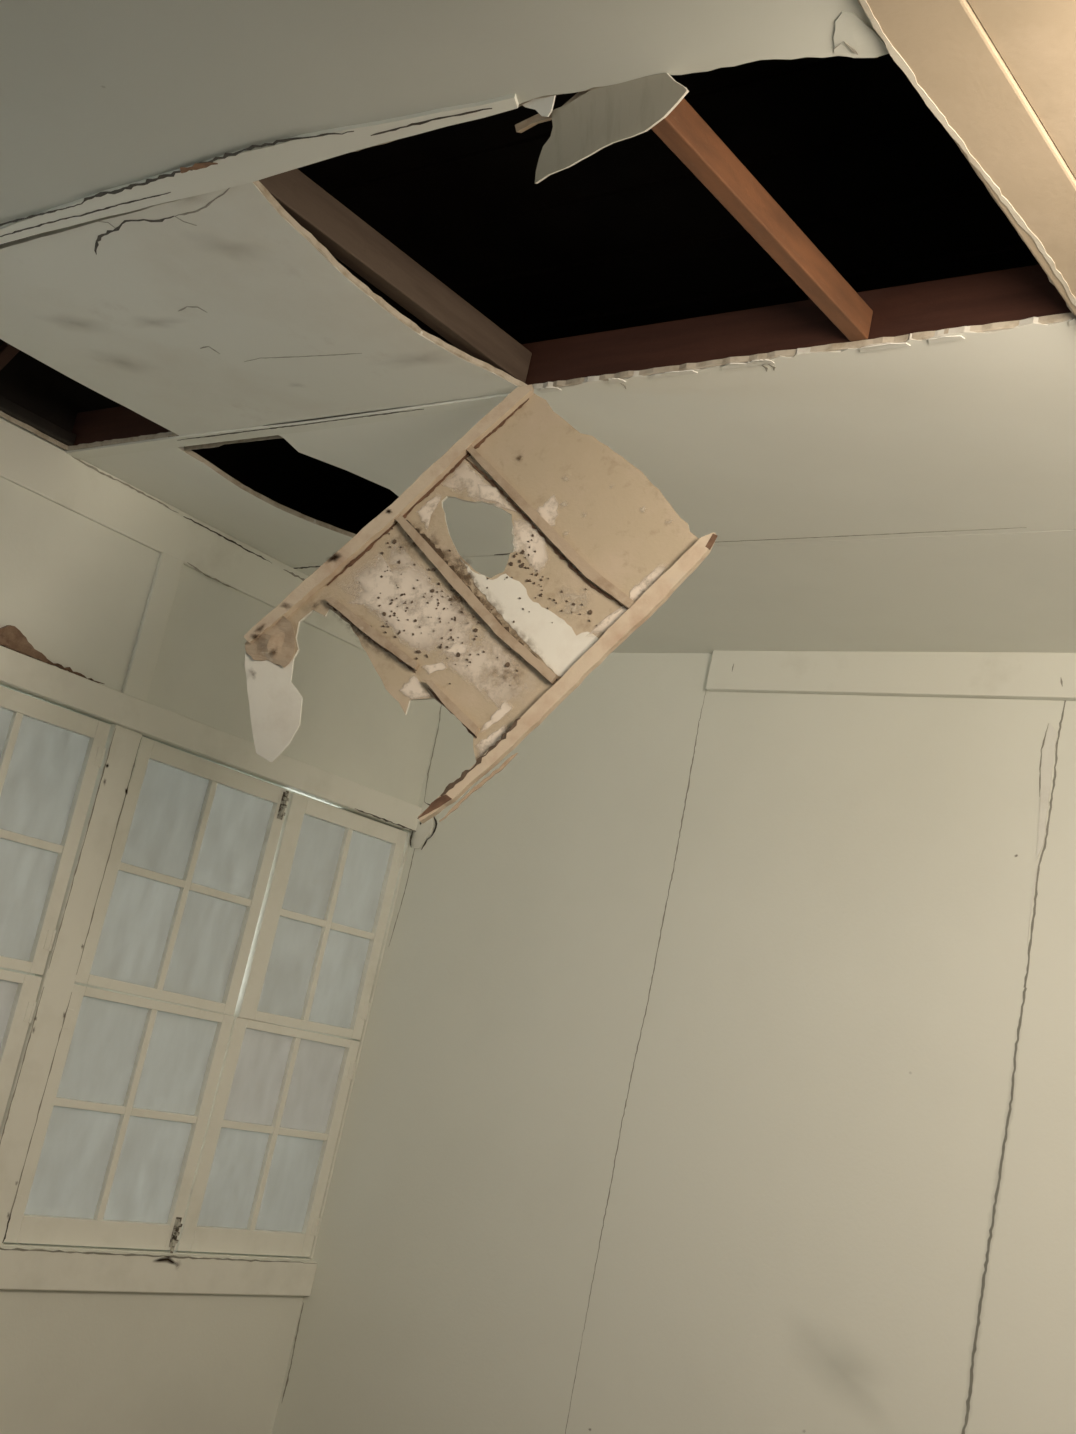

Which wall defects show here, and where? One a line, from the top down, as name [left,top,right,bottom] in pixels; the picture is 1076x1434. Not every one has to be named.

crack [0,108,492,255]
peeling [523,95,556,117]
peeling [859,0,1076,326]
leakage [327,398,627,686]
crack [961,678,1066,1434]